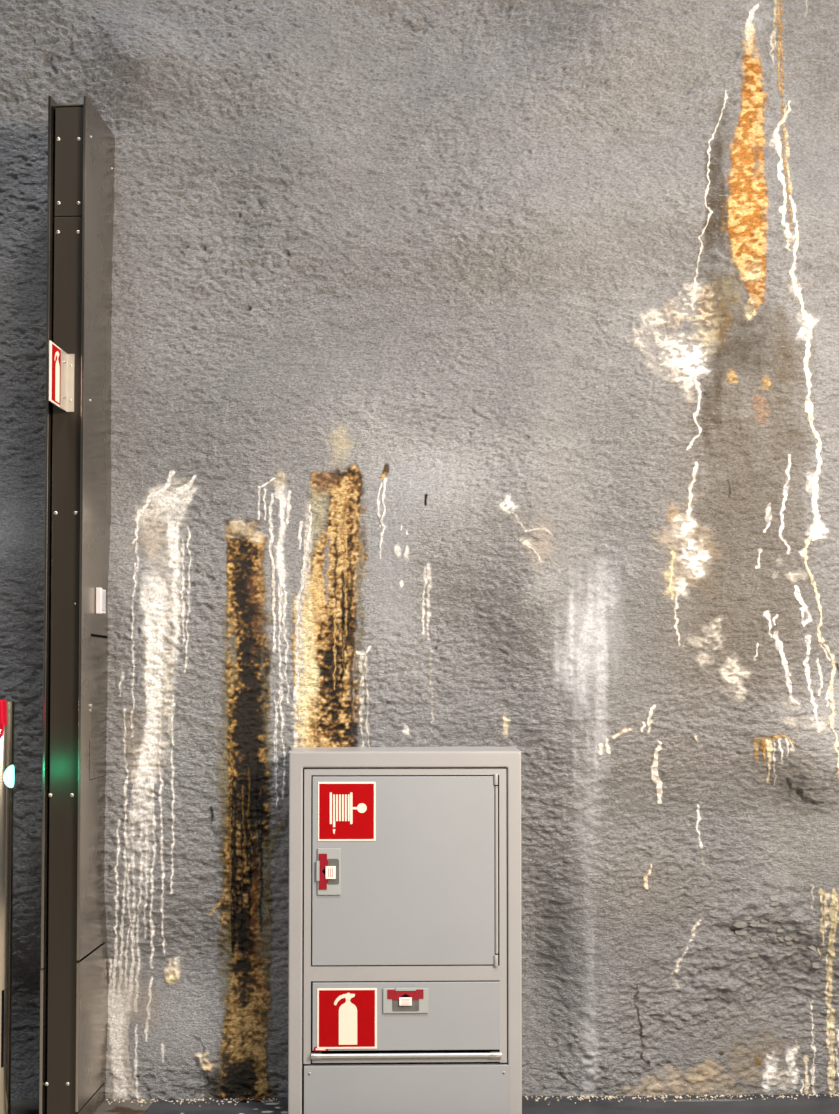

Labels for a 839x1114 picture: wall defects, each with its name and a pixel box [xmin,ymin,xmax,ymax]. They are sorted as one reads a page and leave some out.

crack [691,91,728,310]
corrosion [727,22,768,319]
crack [686,375,702,521]
leakage [645,278,760,422]
crack [755,101,839,772]
leakage [108,470,197,1099]
corrosion [205,519,284,1099]
leakage [258,473,303,807]
corrosion [291,464,389,750]
crack [669,550,680,646]
corrosion [754,734,795,785]
leakage [762,888,839,1094]